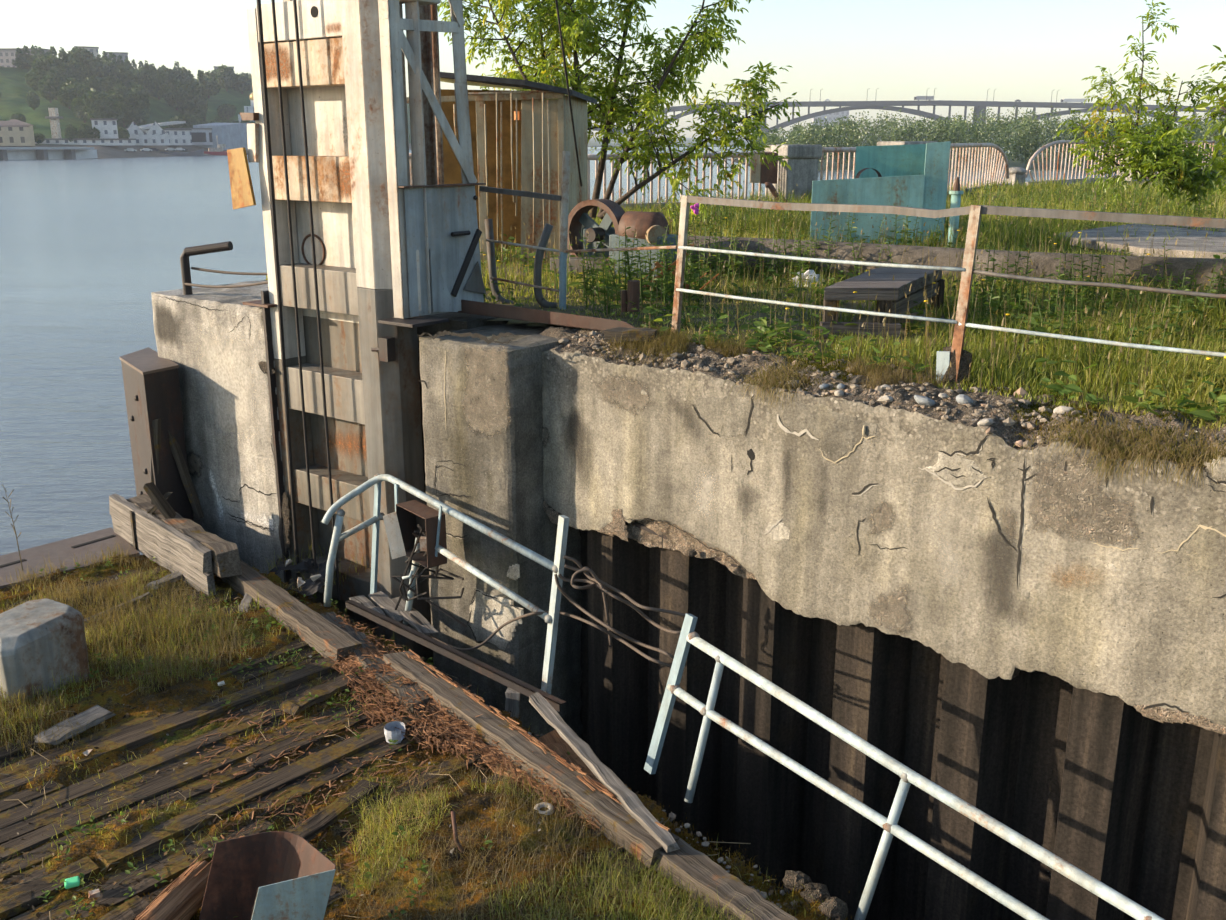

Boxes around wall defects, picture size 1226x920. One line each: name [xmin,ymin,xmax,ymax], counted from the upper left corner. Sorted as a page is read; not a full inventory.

rust [265,48,291,81]
rust [333,163,351,196]
damp [567,412,586,471]
crack [731,394,755,475]
spalling [597,509,756,579]
crack [852,483,907,556]
crack [939,434,1036,590]
damp [988,534,1015,611]
crack [1094,525,1226,553]
crack [1206,476,1226,492]